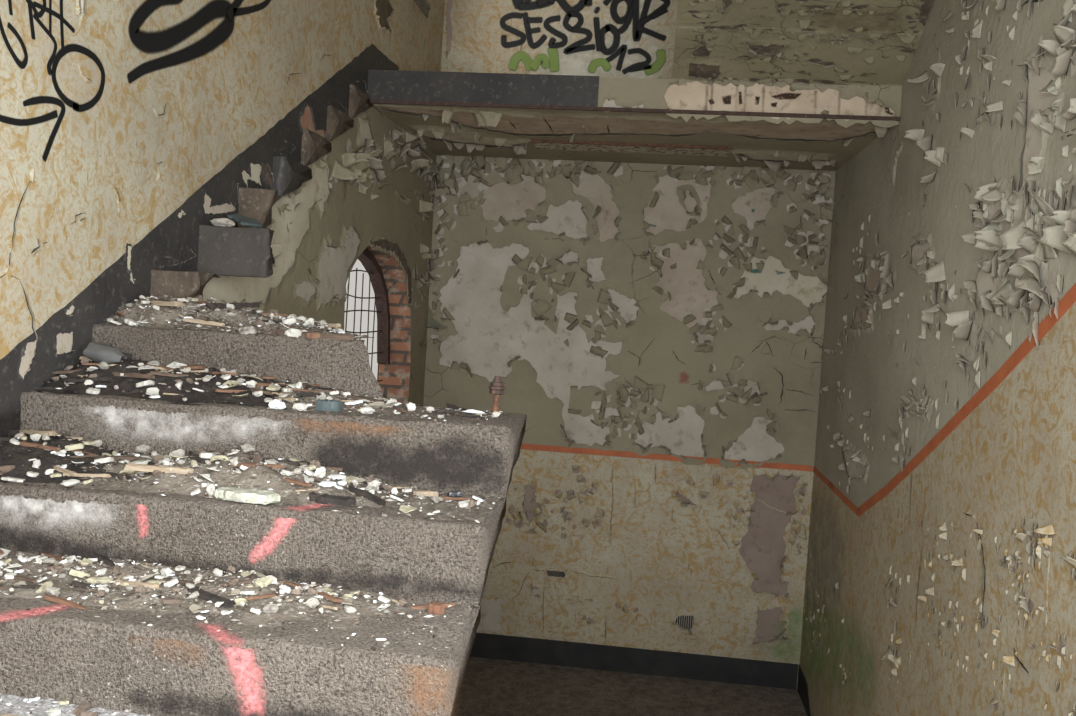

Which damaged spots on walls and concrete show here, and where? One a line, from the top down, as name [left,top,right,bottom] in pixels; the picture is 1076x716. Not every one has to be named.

peeling [17,339,37,382]
peeling [202,0,1076,601]
peeling [878,621,902,684]
peeling [895,515,1018,716]
peeling [970,514,1076,692]